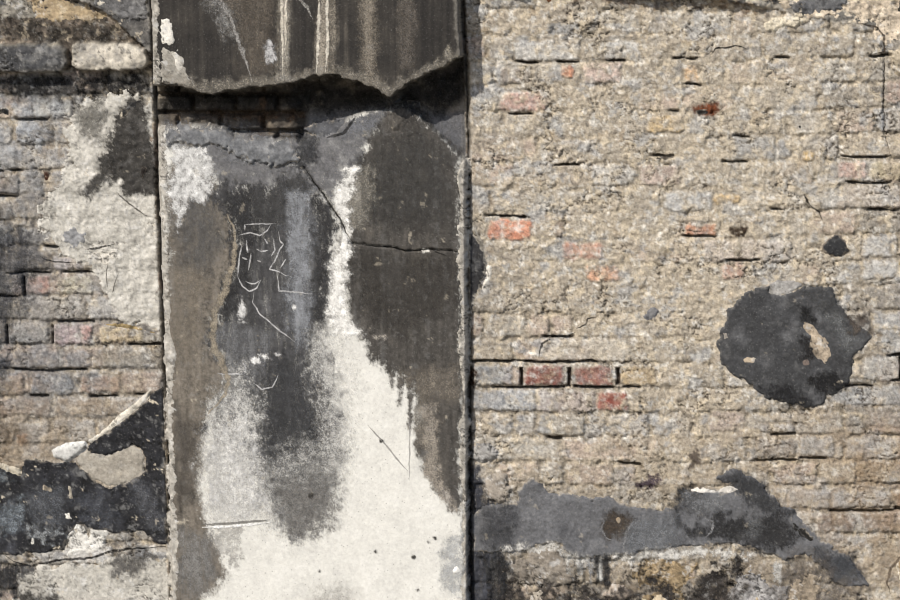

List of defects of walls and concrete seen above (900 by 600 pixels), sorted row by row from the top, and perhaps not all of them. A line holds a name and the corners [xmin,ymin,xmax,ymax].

leakage [165,0,458,94]
leakage [277,129,319,195]
crack [304,168,457,256]
flaking render [0,88,214,600]
leakage [208,216,237,414]
flaking render [455,157,872,600]